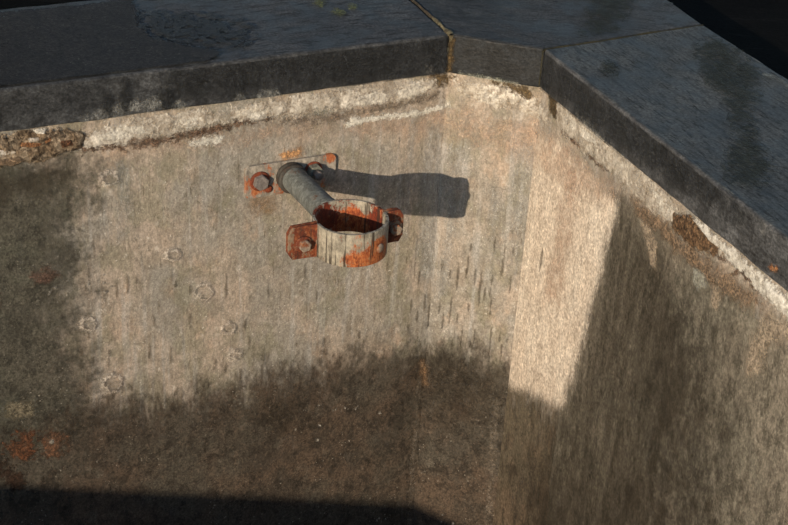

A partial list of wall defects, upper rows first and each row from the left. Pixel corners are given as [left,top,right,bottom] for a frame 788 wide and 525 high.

leakage [0,0,449,121]
peeling [0,78,437,168]
peeling [453,74,788,375]